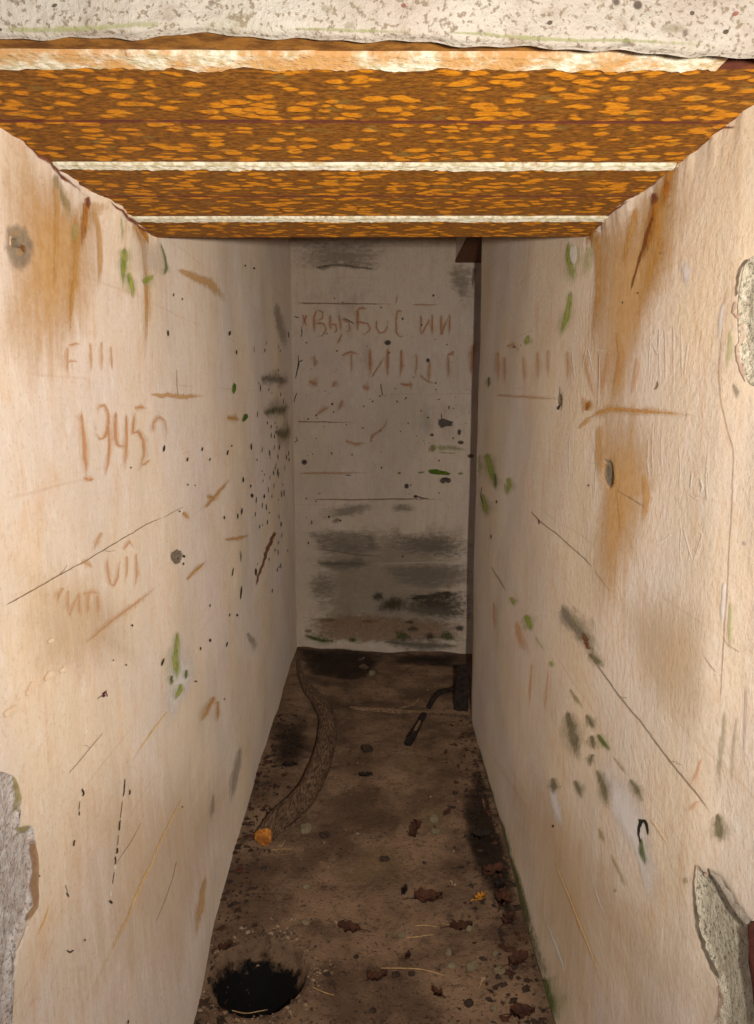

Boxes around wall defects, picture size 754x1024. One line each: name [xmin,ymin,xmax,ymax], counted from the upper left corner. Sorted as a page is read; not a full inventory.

spalling [732,256,754,386]
damp [374,591,466,614]
spalling [0,772,39,1024]
spalling [685,865,754,1024]